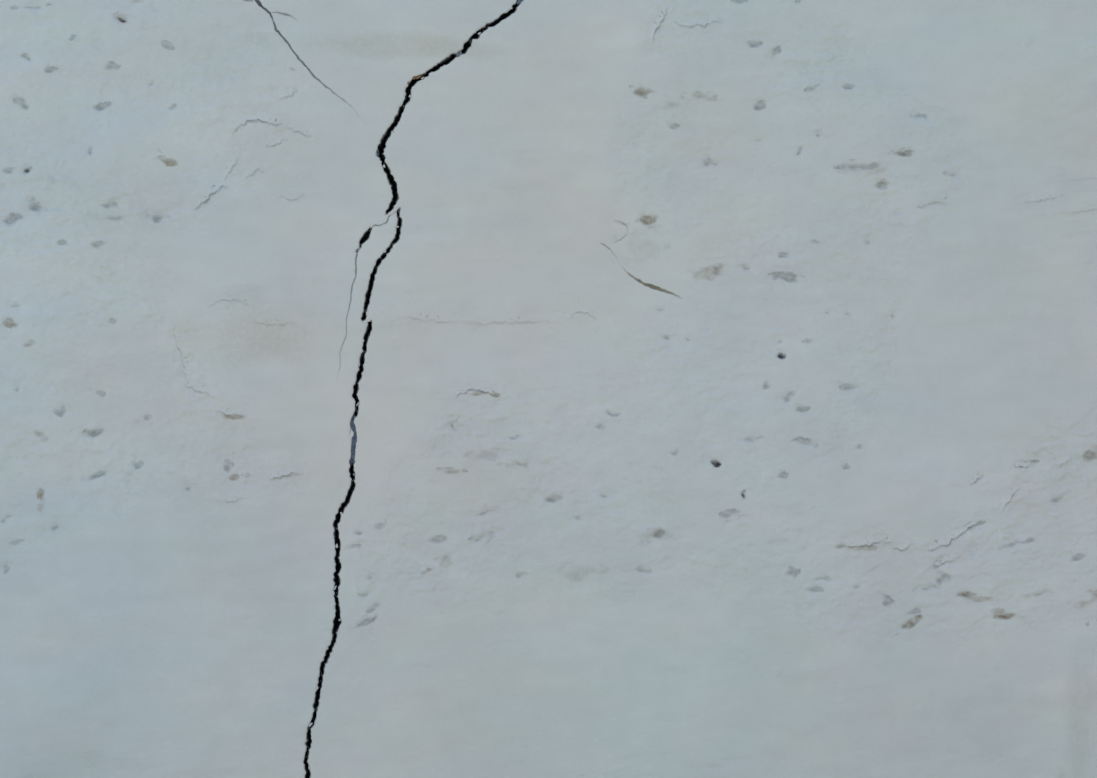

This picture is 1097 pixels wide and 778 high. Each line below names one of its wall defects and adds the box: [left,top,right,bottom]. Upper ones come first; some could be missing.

crack [255,0,293,50]
crack [304,0,522,778]